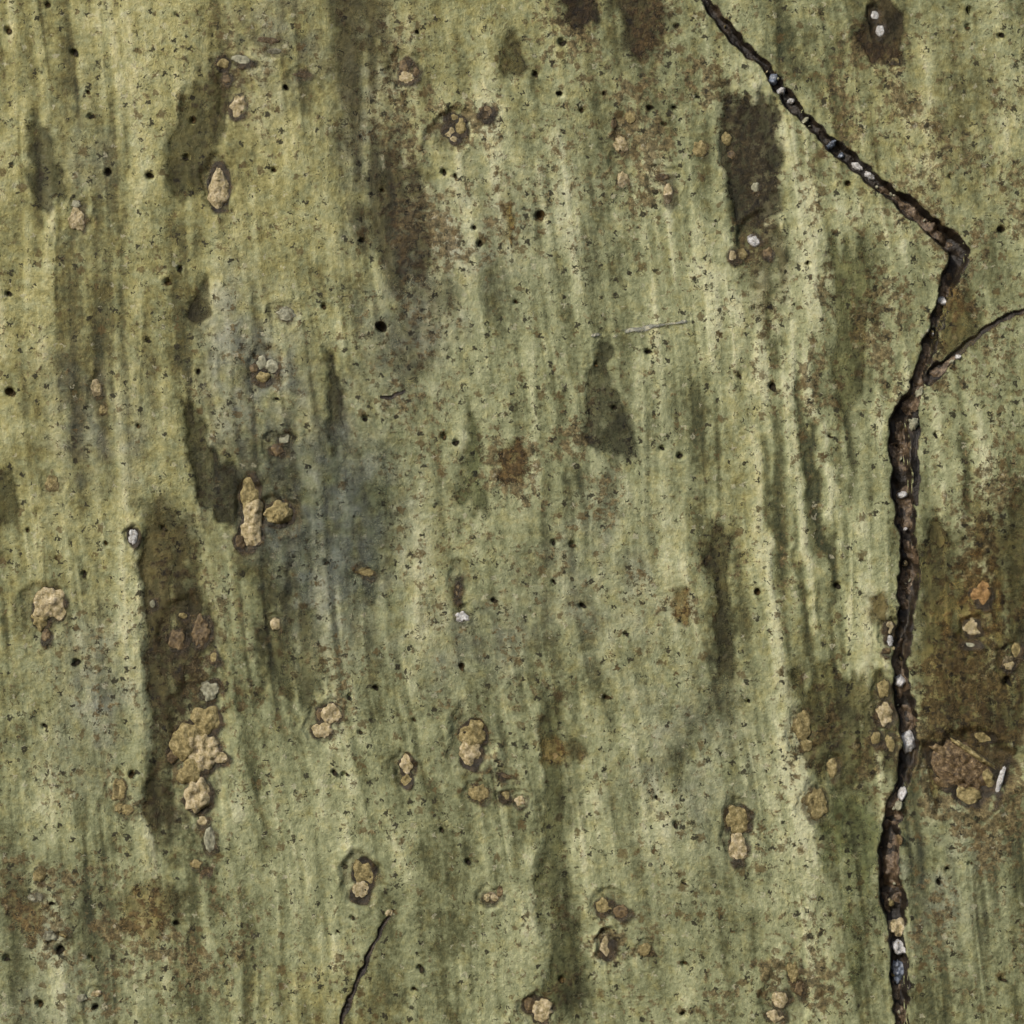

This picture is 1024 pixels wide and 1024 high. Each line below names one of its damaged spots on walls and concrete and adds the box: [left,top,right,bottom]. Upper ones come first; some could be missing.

crack [339,909,393,1024]
crack [701,0,1024,1024]